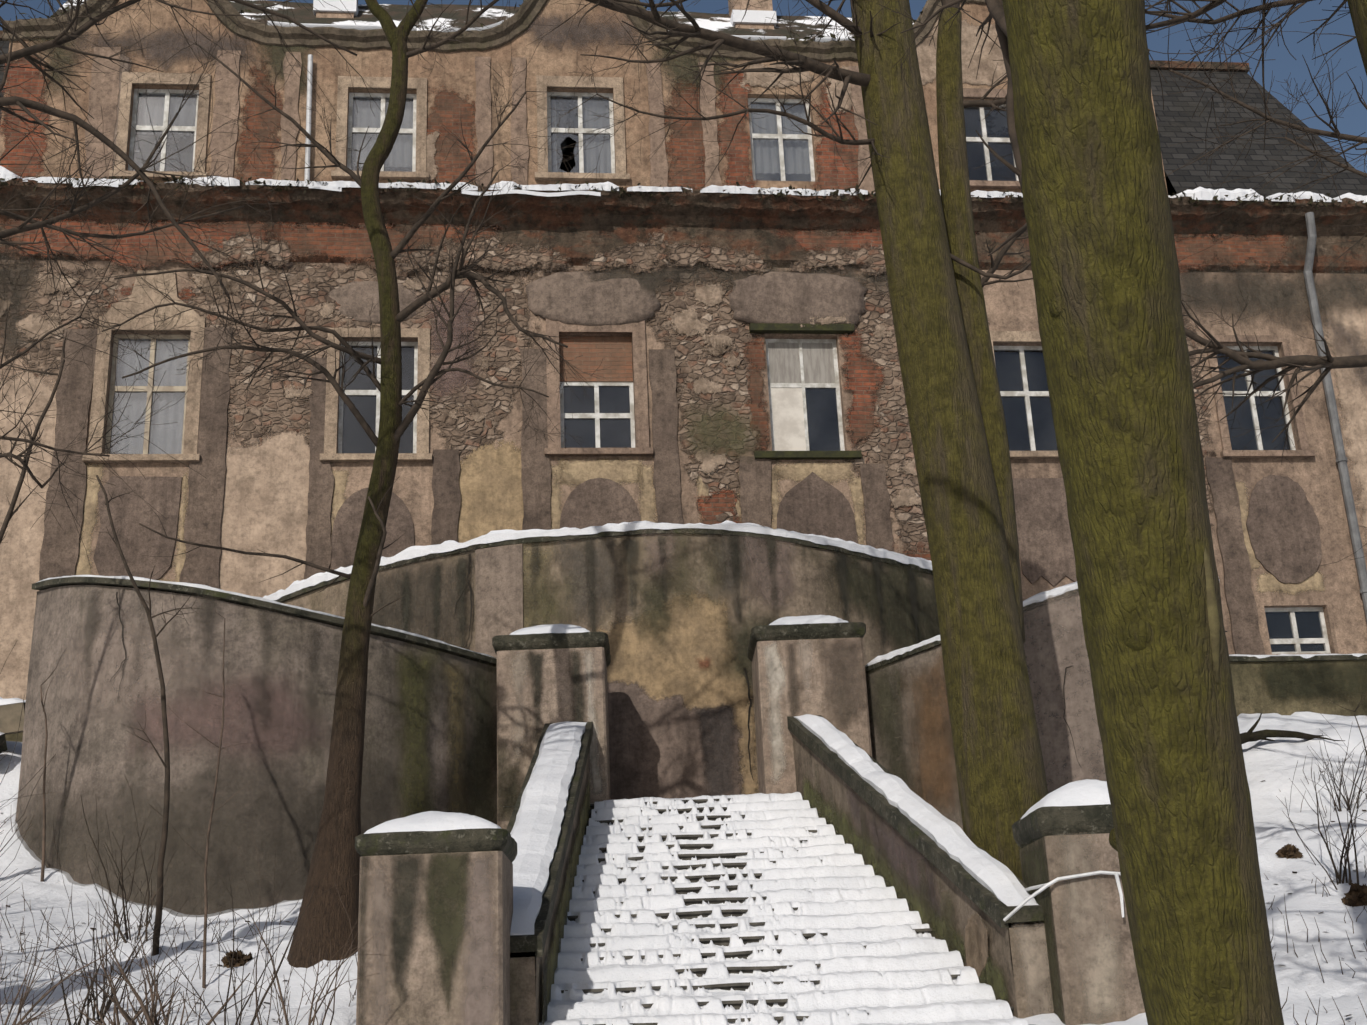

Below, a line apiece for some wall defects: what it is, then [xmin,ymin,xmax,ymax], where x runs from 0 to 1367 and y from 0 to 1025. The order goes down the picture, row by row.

flaking render [0,55,51,178]
flaking render [419,87,476,184]
flaking render [664,60,871,195]
spalling [0,218,380,700]
spalling [386,223,931,560]
leakage [512,536,675,632]
leakage [831,551,940,649]
leakage [74,594,314,754]
crack [744,668,754,780]
leakage [17,770,325,917]
leakage [361,782,387,834]
leakage [359,853,495,1025]